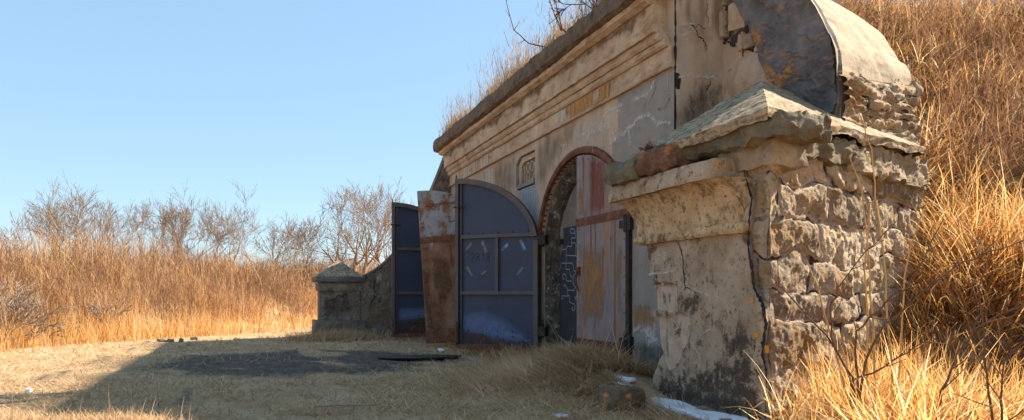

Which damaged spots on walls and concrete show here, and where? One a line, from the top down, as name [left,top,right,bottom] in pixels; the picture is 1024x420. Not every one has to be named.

crack [674,0,758,129]
corrosion [583,154,604,212]
leakage [679,290,709,314]
crack [744,171,768,420]
leakage [632,306,763,420]